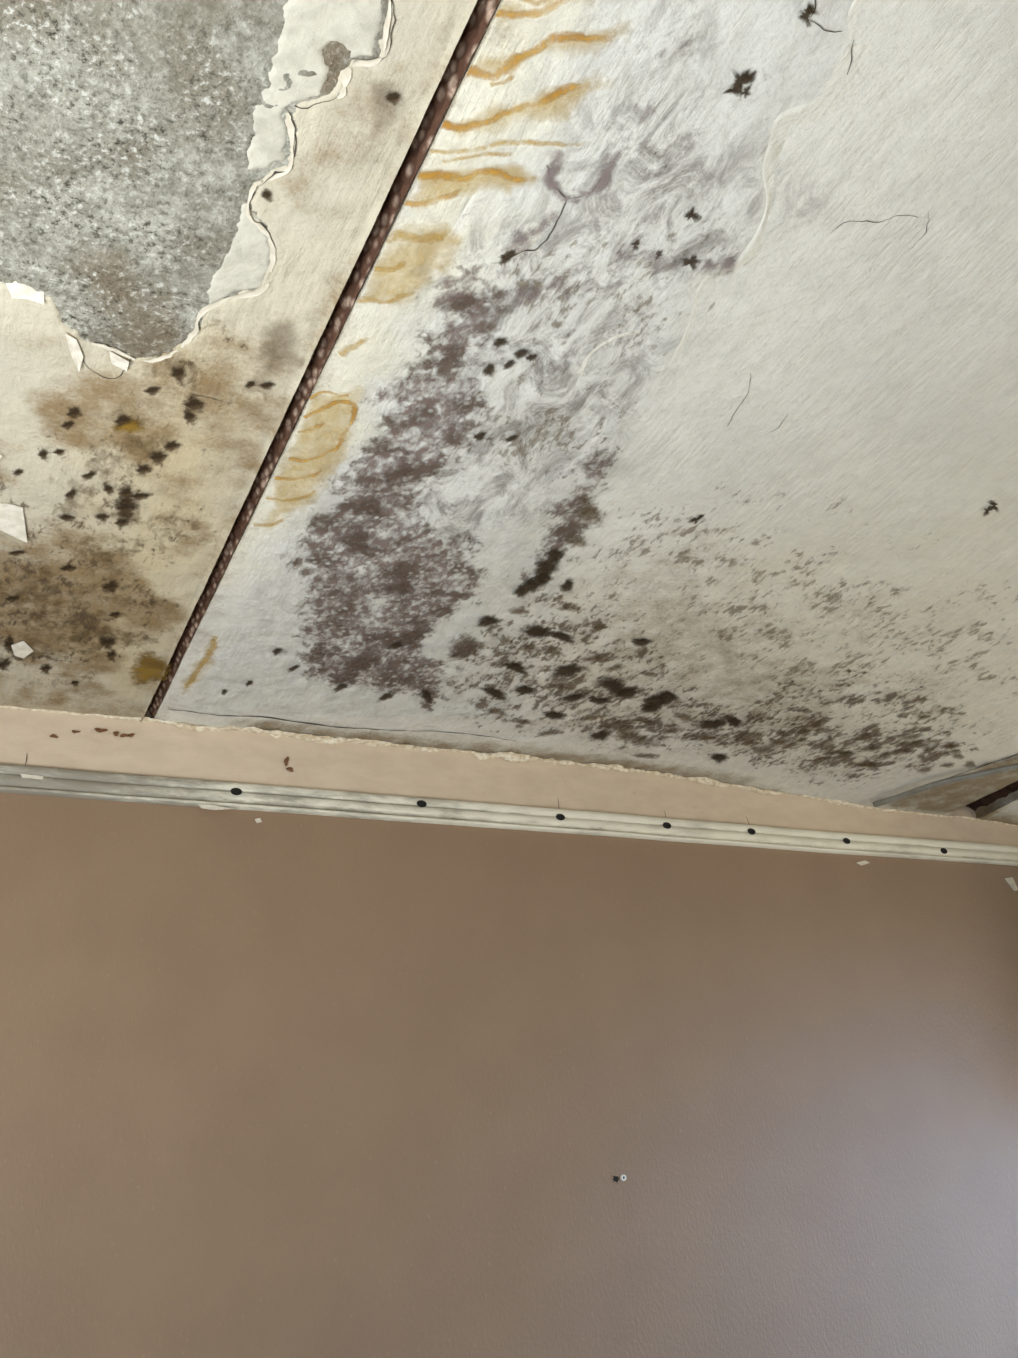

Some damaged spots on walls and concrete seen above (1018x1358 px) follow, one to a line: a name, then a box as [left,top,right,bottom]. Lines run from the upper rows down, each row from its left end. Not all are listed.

crack [382,2,396,60]
crack [811,0,854,74]
water stain [724,70,756,98]
crack [260,94,339,186]
spalling [0,0,392,371]
water stain [543,152,569,201]
water stain [500,214,554,263]
water stain [682,255,736,270]
water stain [38,407,81,460]
water stain [184,396,203,423]
water stain [286,268,984,784]
water stain [0,441,180,685]